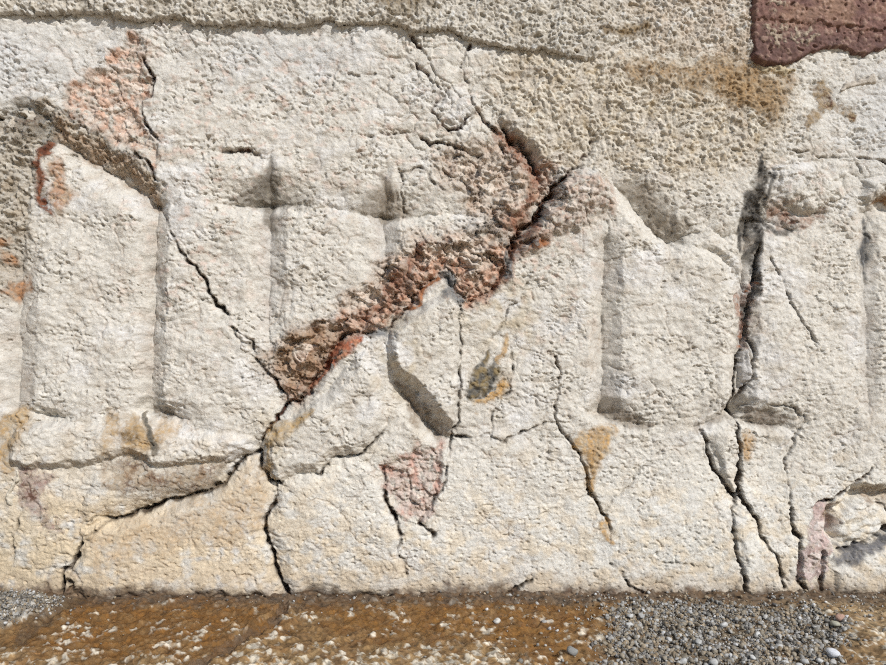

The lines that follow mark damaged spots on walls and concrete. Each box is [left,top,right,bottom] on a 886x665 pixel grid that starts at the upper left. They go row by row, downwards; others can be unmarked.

flaking render [0,31,164,281]
crack [178,246,229,315]
flaking render [265,134,617,402]
crack [421,111,584,291]
damp [737,155,793,339]
crack [63,330,370,665]
crack [382,470,436,541]
flaking render [380,440,444,522]
crack [449,371,466,442]
crack [559,429,610,528]
crack [699,244,886,591]
flaking render [796,499,836,588]